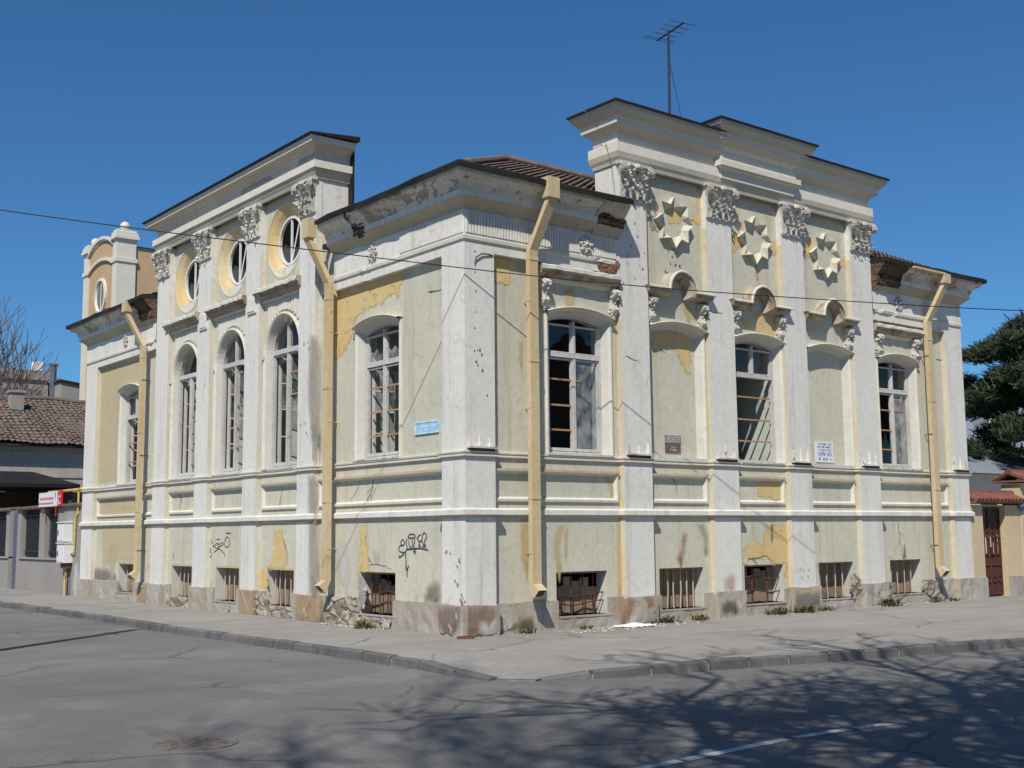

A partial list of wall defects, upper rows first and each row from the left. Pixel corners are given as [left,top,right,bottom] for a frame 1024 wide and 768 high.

peeling [333,271,406,361]
peeling [651,330,692,374]
flaking render [254,528,292,618]
flaking render [325,523,391,629]
peeling [742,522,810,588]